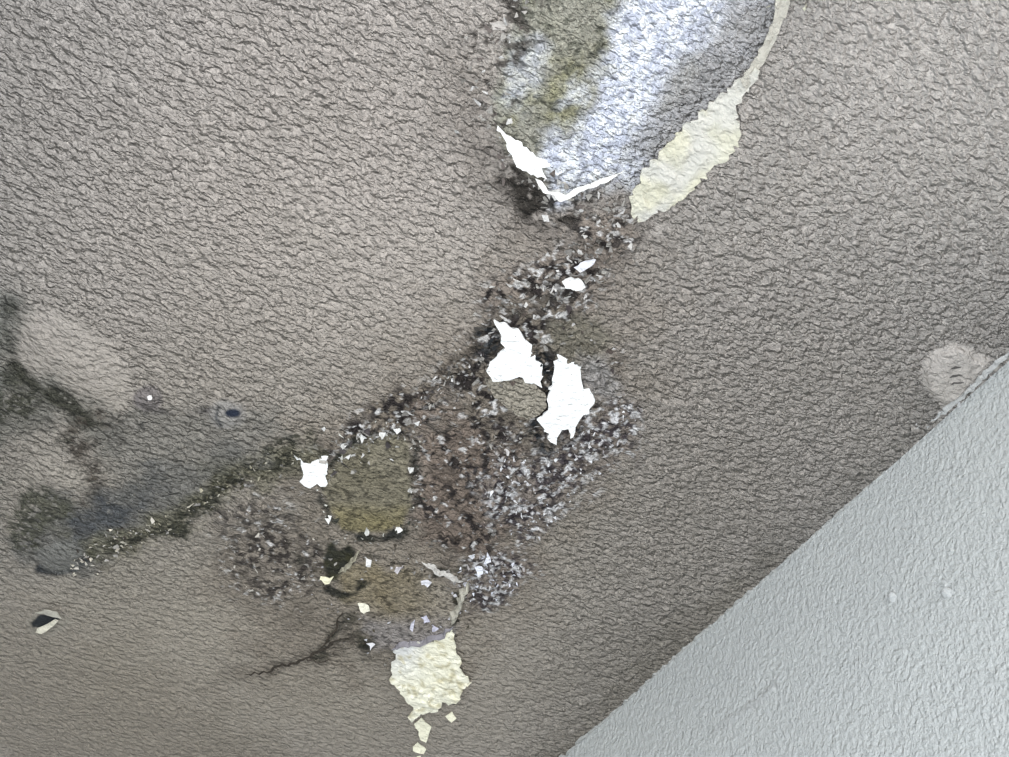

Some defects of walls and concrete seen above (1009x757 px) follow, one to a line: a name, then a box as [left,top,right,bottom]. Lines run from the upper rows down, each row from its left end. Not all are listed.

damp [0,28,544,757]
peeling [202,0,813,672]
damp [441,0,868,706]
damp [965,313,1009,398]
crack [245,611,382,680]
peeling [413,717,431,757]
damp [510,397,955,757]